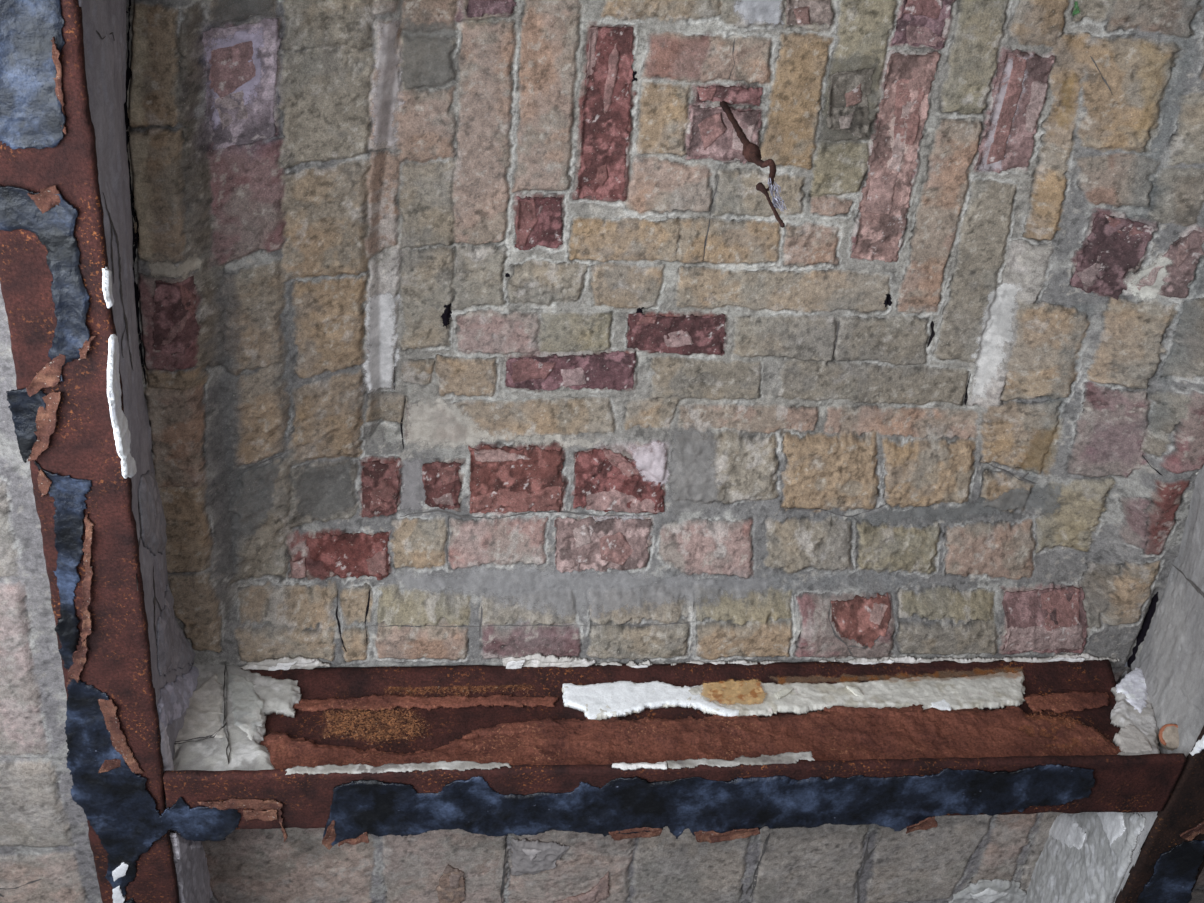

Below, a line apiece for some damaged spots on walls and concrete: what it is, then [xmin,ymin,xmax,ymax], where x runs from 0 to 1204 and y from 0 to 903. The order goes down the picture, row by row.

crack [96,0,147,384]
peeling [0,185,288,903]
crack [1173,565,1204,598]
crack [1127,592,1158,668]
rust [323,684,533,745]
rust [701,679,765,705]
spalling [1189,735,1204,756]
peeling [322,764,1146,903]
peeling [1137,820,1204,903]